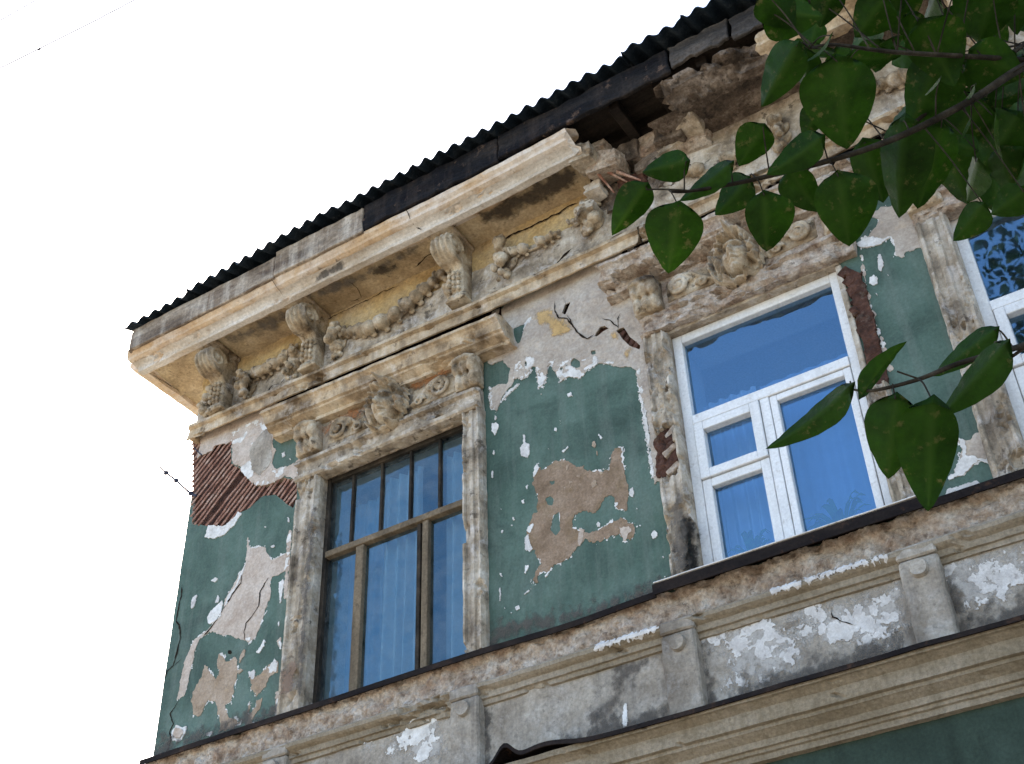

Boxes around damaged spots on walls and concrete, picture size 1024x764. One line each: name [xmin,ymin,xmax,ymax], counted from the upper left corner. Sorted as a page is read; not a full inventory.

damp [479,168,576,224]
crack [506,203,577,239]
crack [554,302,620,339]
peeling [837,205,921,364]
peeling [487,266,679,484]
peeling [197,402,300,486]
peeling [499,434,641,614]
peeling [944,546,1024,610]
crack [164,587,182,679]
peeling [171,517,292,742]
peeling [701,582,905,695]
peeling [385,707,447,764]